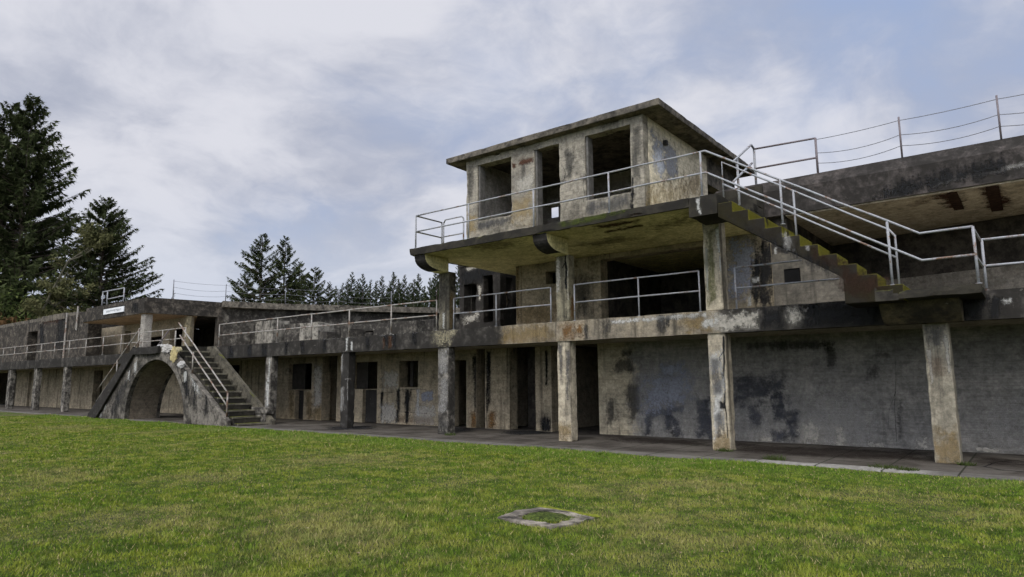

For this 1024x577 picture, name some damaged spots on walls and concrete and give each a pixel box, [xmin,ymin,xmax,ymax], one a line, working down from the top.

damp [395,389,420,424]
damp [627,384,643,420]